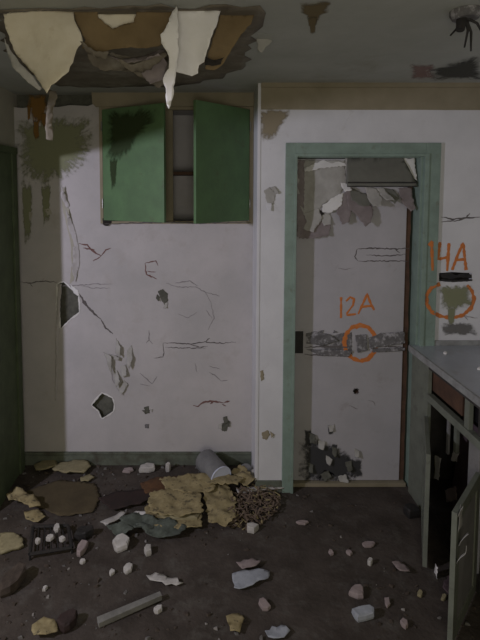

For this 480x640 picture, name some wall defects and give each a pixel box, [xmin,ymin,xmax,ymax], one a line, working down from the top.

peeling [0,4,266,141]
damp [413,58,479,79]
corrosion [27,95,46,138]
damp [18,119,92,237]
peeling [297,158,417,239]
crack [443,213,479,222]
crack [79,243,110,261]
peeling [55,187,80,400]
crack [24,280,113,334]
crack [145,260,231,358]
damp [440,286,475,335]
flaking render [91,392,115,419]